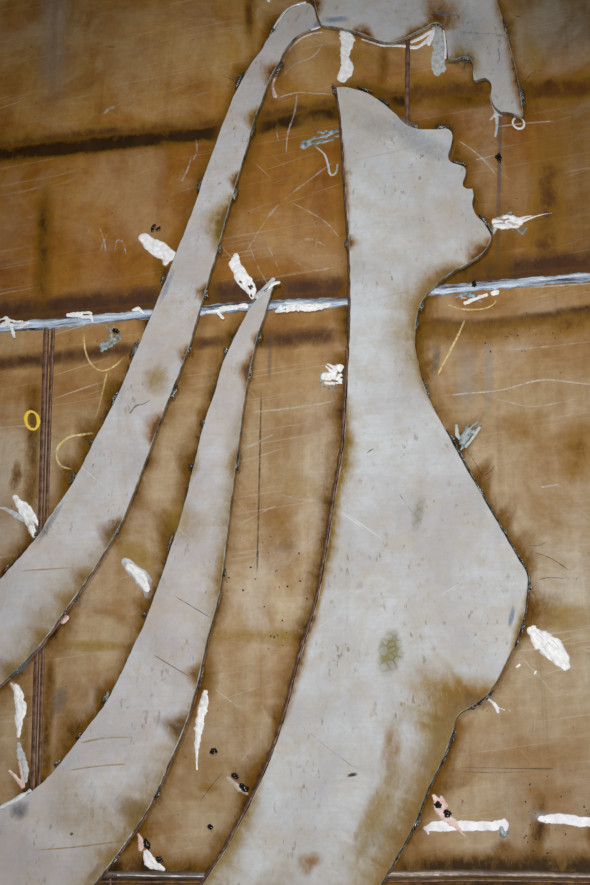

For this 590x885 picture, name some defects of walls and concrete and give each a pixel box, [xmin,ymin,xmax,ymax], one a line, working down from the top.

rust [0,0,279,199]
rust [339,50,491,135]
rust [498,3,590,123]
rust [0,195,171,331]
rust [0,314,246,796]
rust [88,48,355,885]
rust [448,427,474,459]
rust [362,667,590,885]